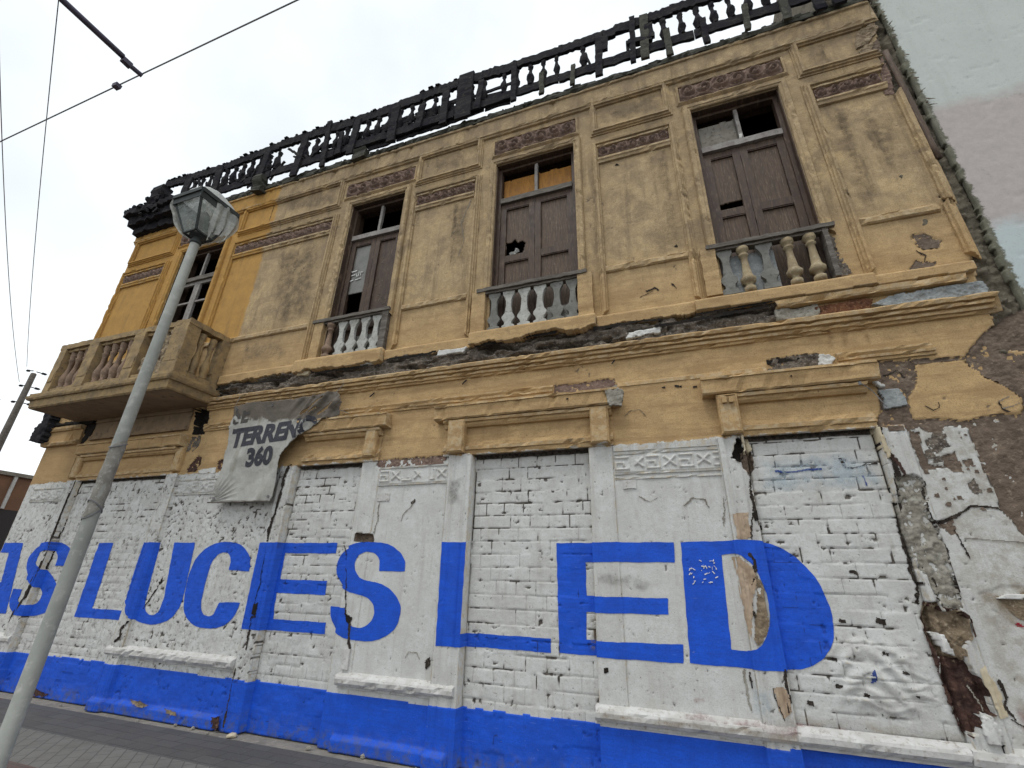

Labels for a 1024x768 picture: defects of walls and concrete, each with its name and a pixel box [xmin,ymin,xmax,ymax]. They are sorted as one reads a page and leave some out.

spalling [216,301,820,397]
spalling [766,353,835,370]
peeling [855,2,1024,746]
crack [8,480,84,622]
crack [222,464,292,728]
crack [344,546,352,649]
peeling [732,557,769,645]
crack [870,424,1024,605]